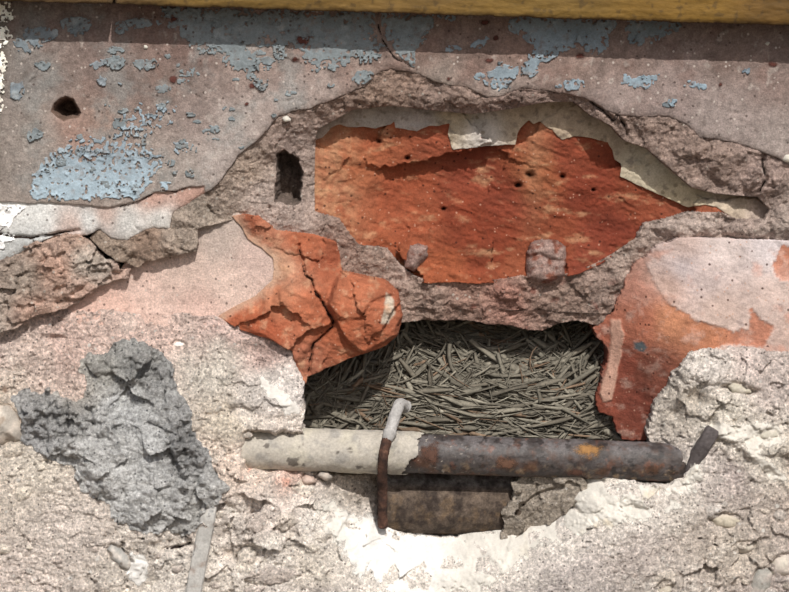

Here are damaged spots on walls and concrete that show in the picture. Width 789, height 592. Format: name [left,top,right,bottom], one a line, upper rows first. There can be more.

spalling [0,1,789,332]
crack [299,249,334,370]
corrosion [421,442,438,466]
corrosion [577,445,599,459]